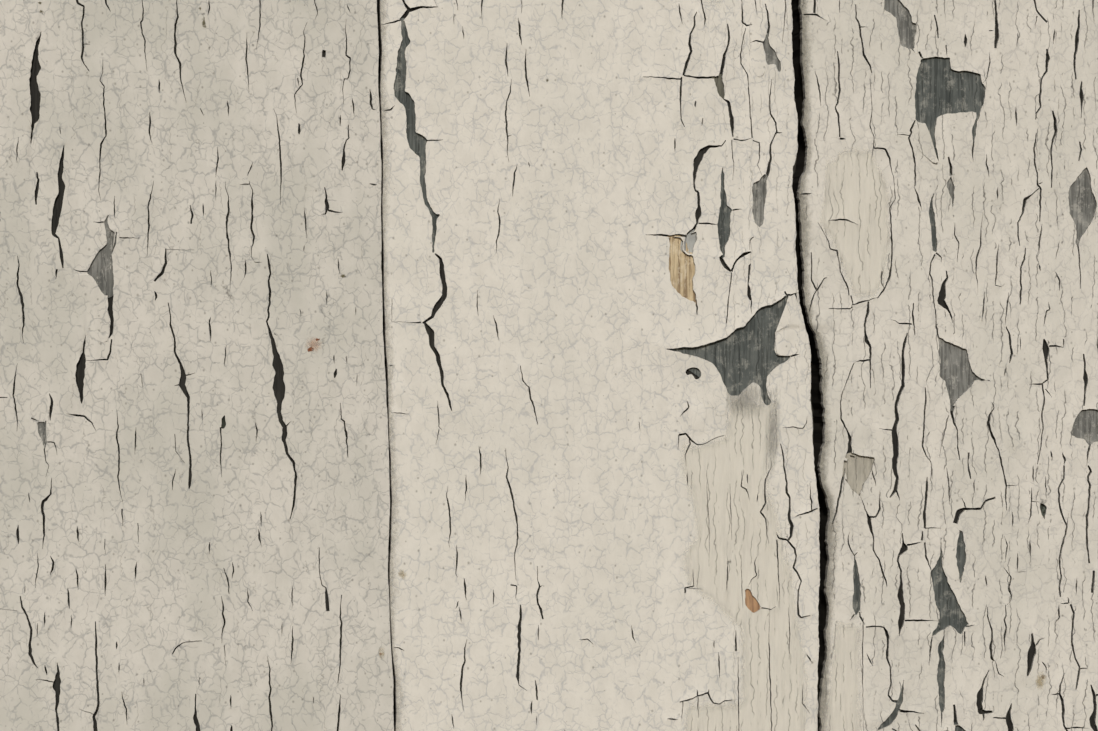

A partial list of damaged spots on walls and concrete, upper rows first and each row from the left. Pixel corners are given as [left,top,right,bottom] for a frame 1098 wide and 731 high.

crack [16,130,65,277]
crack [16,478,144,731]
crack [147,181,203,489]
crack [190,147,297,518]
peeling [383,0,452,411]
crack [446,450,543,727]
peeling [667,292,804,731]
crack [862,310,974,698]
peeling [884,0,985,185]
peeling [928,549,971,653]
peeling [937,335,988,430]
peeling [1068,168,1096,255]